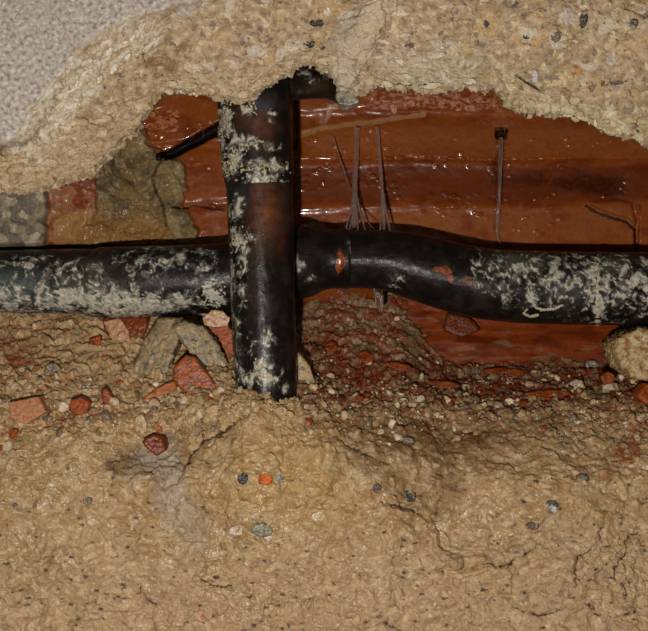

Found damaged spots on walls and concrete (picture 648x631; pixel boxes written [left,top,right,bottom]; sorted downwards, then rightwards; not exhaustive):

spalling [0,11,180,195]
spalling [153,47,337,99]
spalling [335,87,359,111]
spalling [370,33,648,142]
peeling [335,252,345,272]
peeling [434,265,475,287]
crack [175,414,249,487]
crack [386,503,422,516]
crack [464,546,536,571]
crack [613,533,638,599]